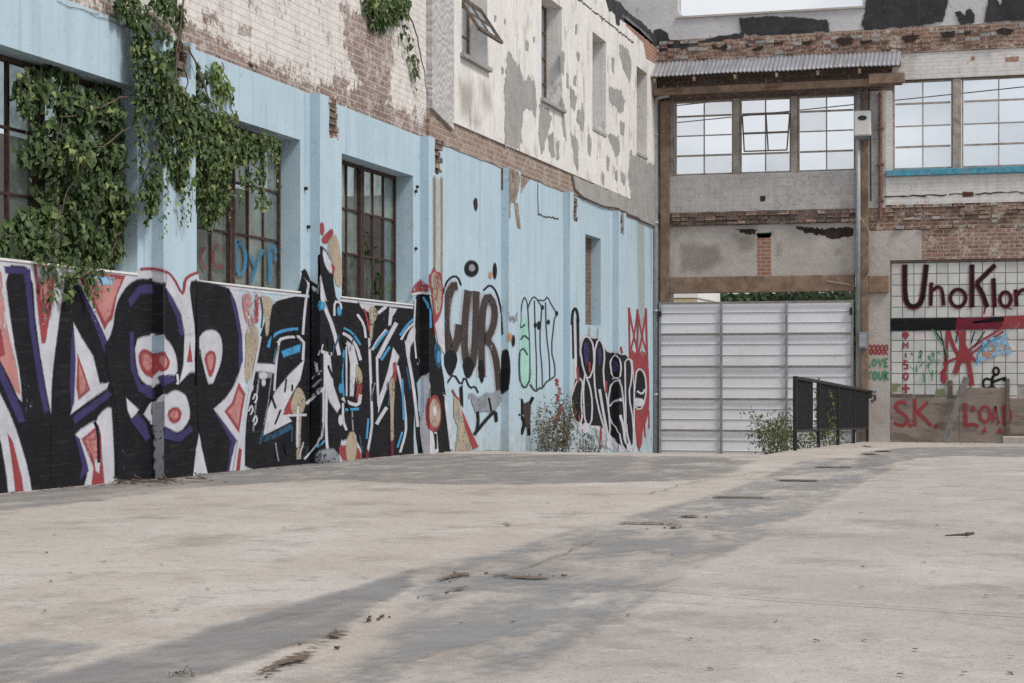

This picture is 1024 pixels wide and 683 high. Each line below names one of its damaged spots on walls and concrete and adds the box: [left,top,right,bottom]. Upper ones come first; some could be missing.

spalling [624,19,1024,64]
peeling [170,3,444,174]
flaking render [502,51,592,170]
flaking render [602,44,655,209]
flaking render [501,168,530,229]
spalling [672,196,856,276]
crack [884,190,1024,198]
spalling [885,202,1024,229]